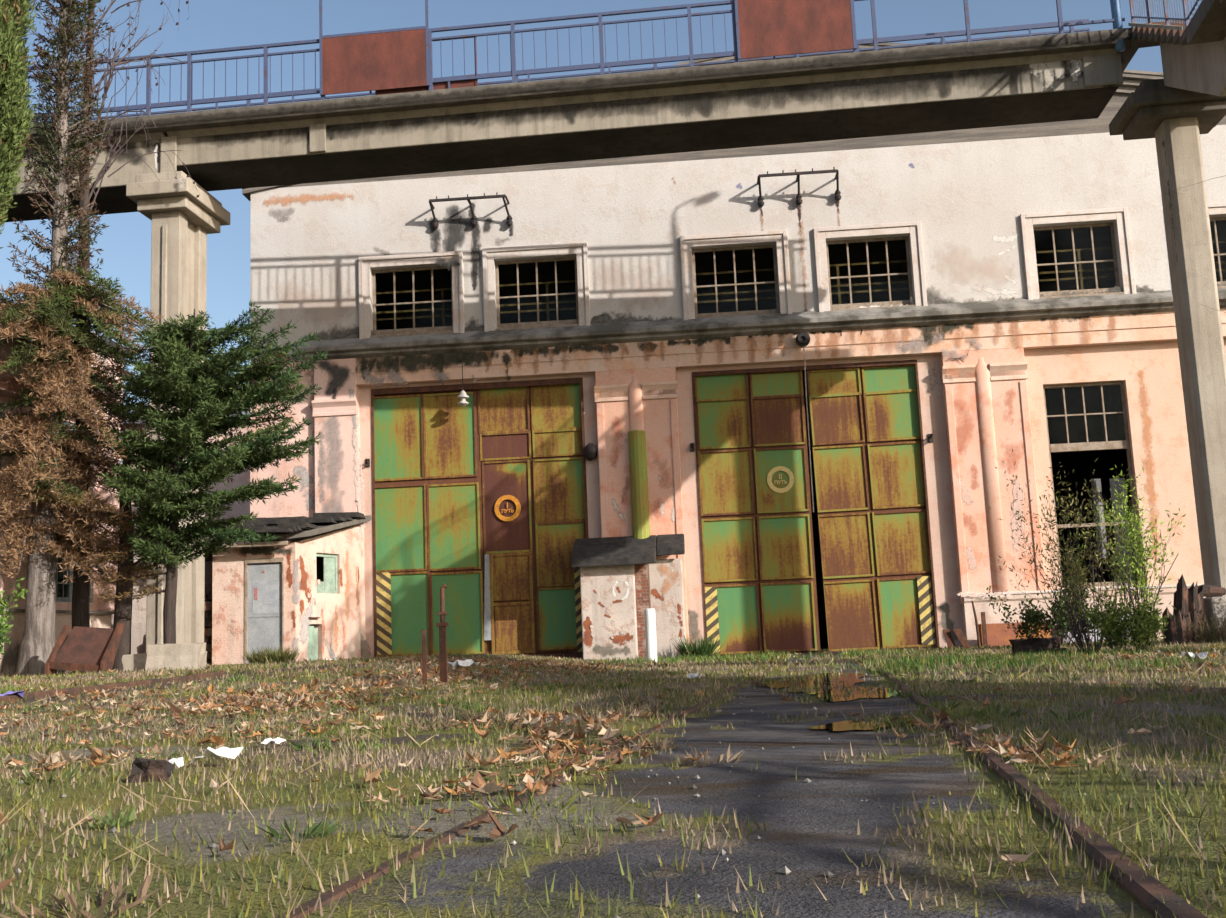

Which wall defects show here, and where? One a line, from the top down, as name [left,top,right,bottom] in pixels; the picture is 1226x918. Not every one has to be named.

damp [91,33,1132,142]
damp [107,141,160,169]
damp [429,203,492,290]
damp [639,337,730,352]
flaking render [286,553,346,659]
flaking render [583,586,622,646]
flaking render [610,631,633,645]
flaking render [651,589,683,638]